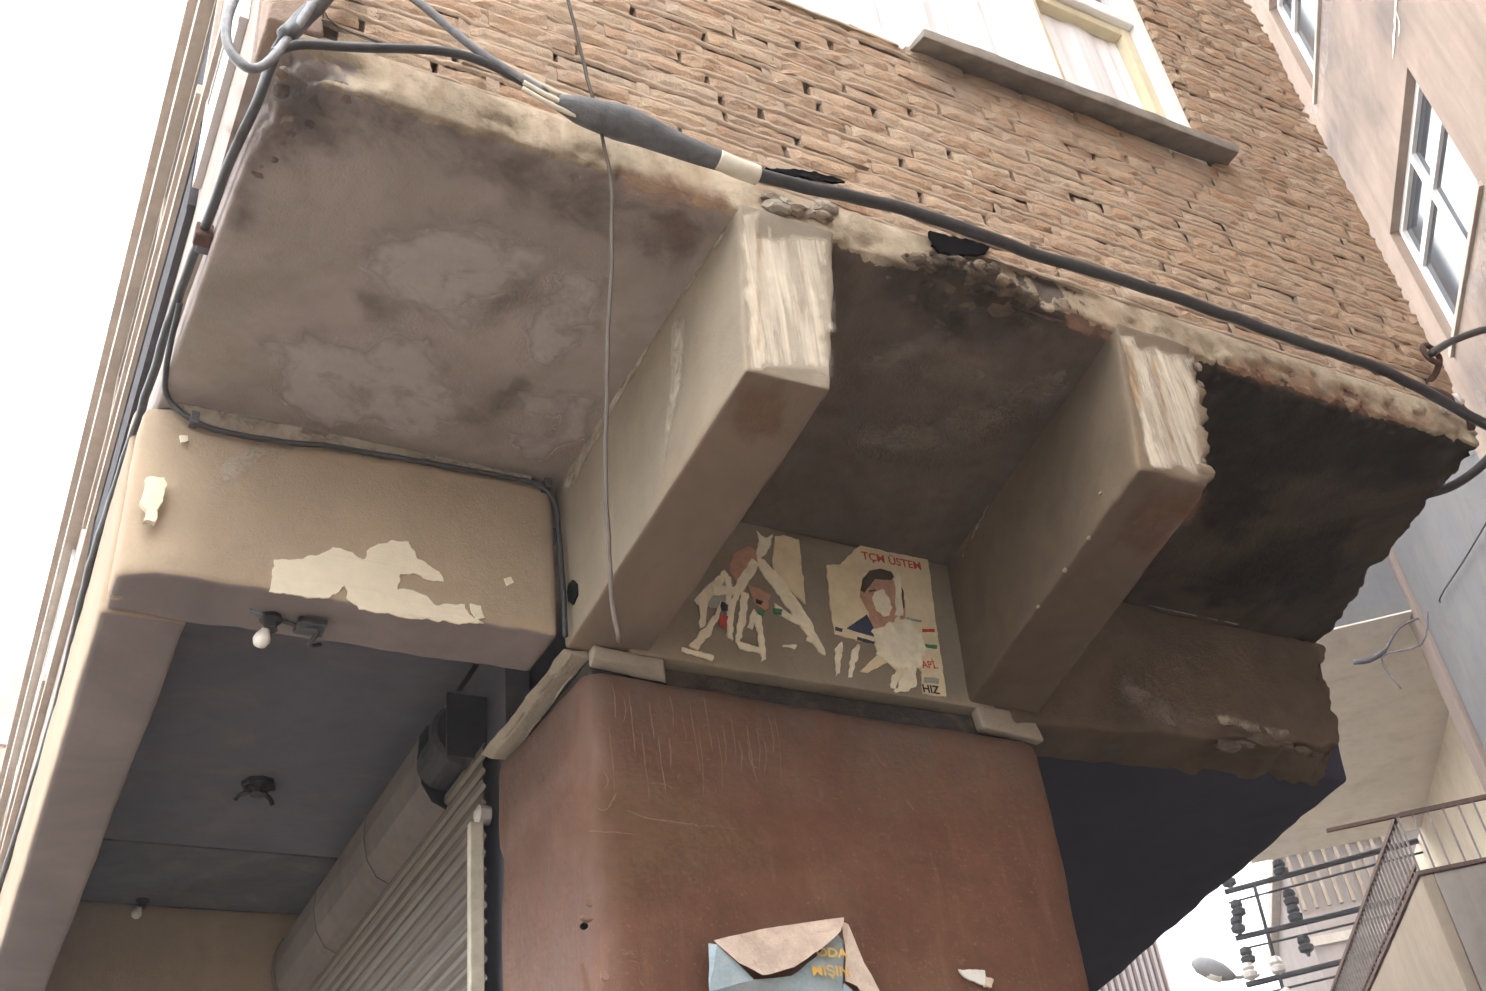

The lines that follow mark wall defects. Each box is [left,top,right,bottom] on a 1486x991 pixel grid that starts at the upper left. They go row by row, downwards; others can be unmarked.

leakage [368,229,546,330]
leakage [526,272,606,364]
spalling [885,230,1072,336]
leakage [265,334,460,438]
leakage [513,346,649,487]
leakage [666,321,683,433]
peeling [139,476,167,526]
peeling [269,540,485,625]